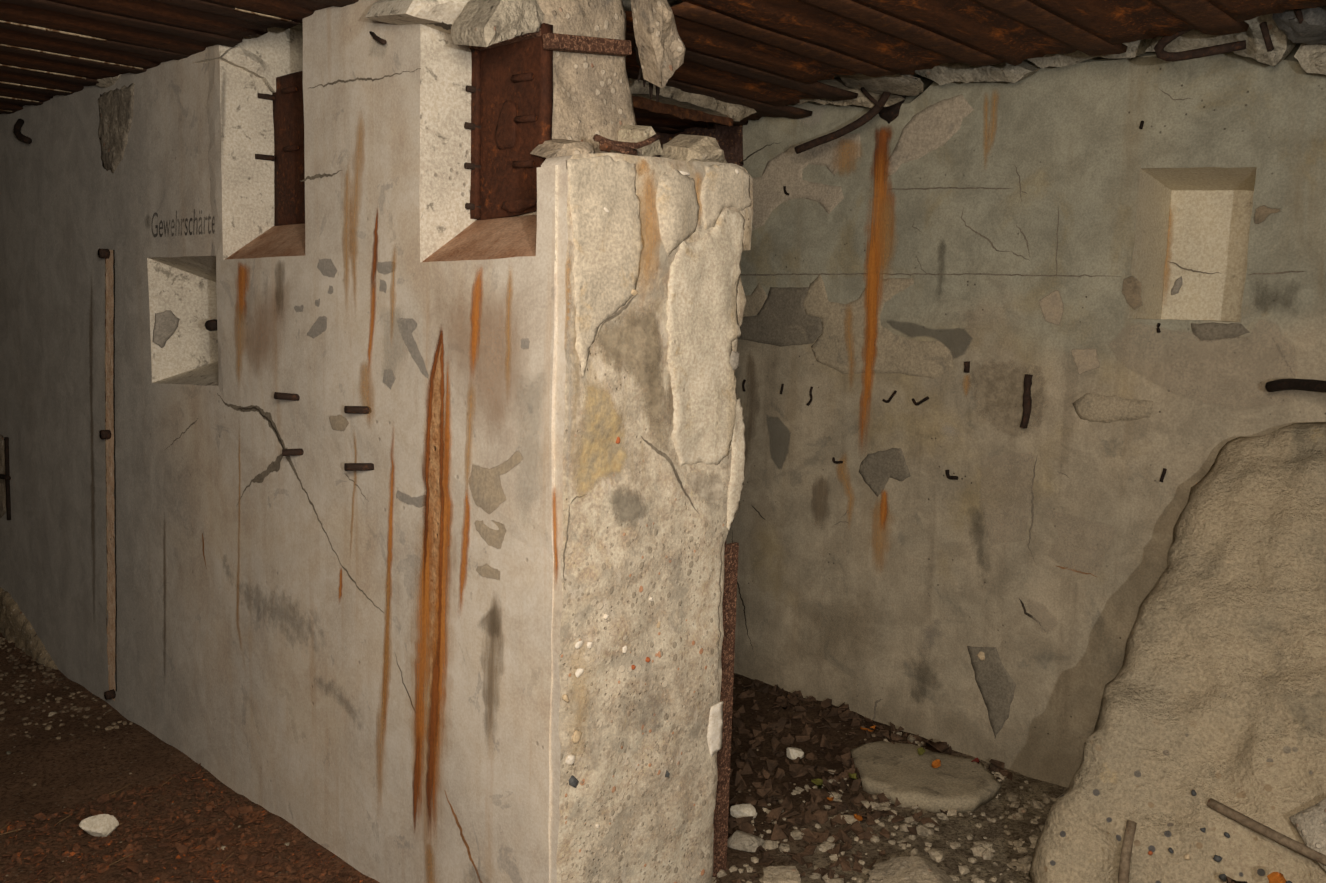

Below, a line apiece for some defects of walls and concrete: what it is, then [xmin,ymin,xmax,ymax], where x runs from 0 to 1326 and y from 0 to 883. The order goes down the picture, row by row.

spalling [0,434,11,520]
crack [165,393,385,614]
corrosion [413,331,470,826]
corrosion [471,273,481,366]
flaking render [566,87,974,530]
corrosion [847,128,893,436]
spalling [1020,374,1033,428]